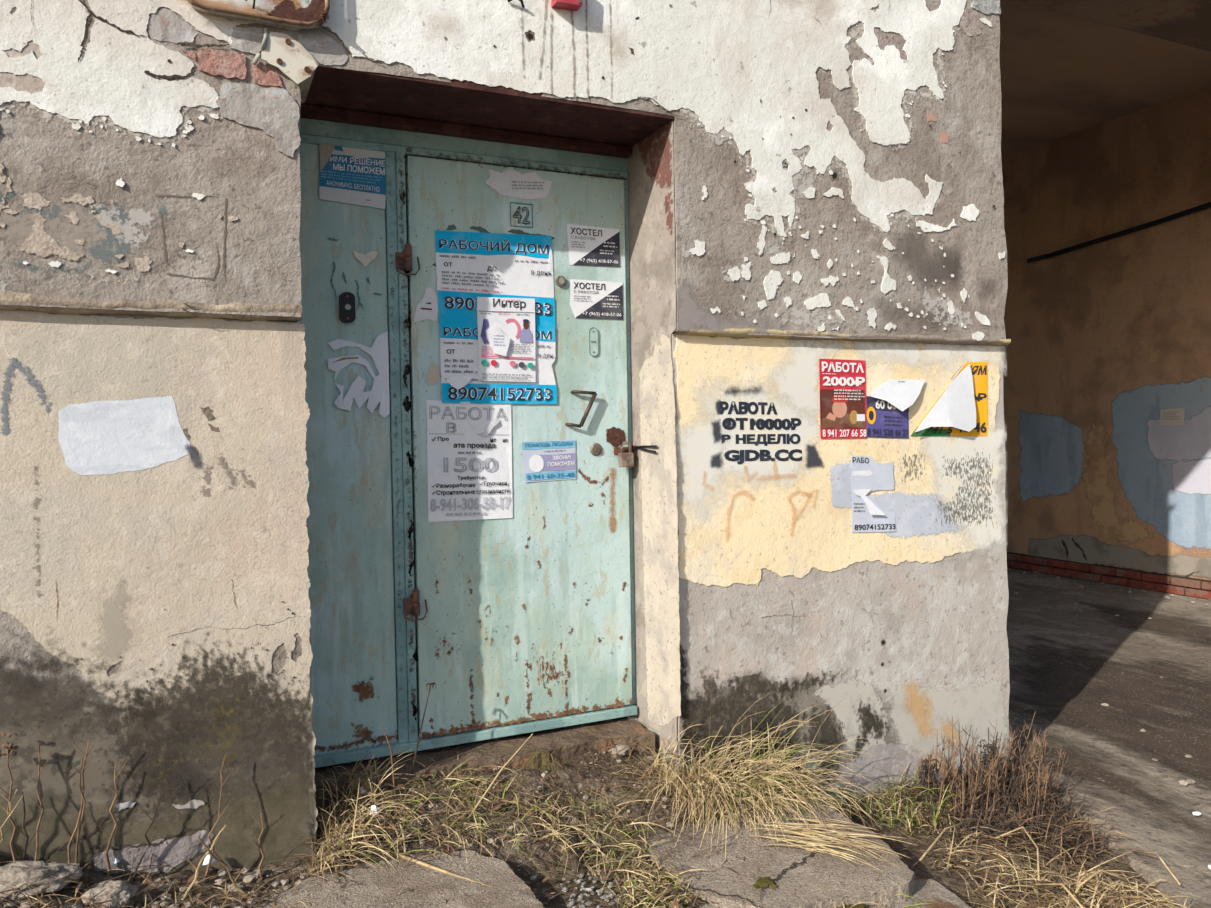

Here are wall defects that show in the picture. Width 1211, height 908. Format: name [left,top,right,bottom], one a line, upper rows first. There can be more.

crack [78,0,144,63]
flaking render [0,8,348,158]
crack [144,43,230,79]
corrosion [182,0,329,26]
flaking render [831,0,1001,151]
peeling [0,162,125,268]
peeling [636,122,673,235]
peeling [679,108,946,282]
water stain [32,466,42,598]
water stain [1087,604,1211,645]
water stain [0,585,316,871]
water stain [679,637,1211,834]